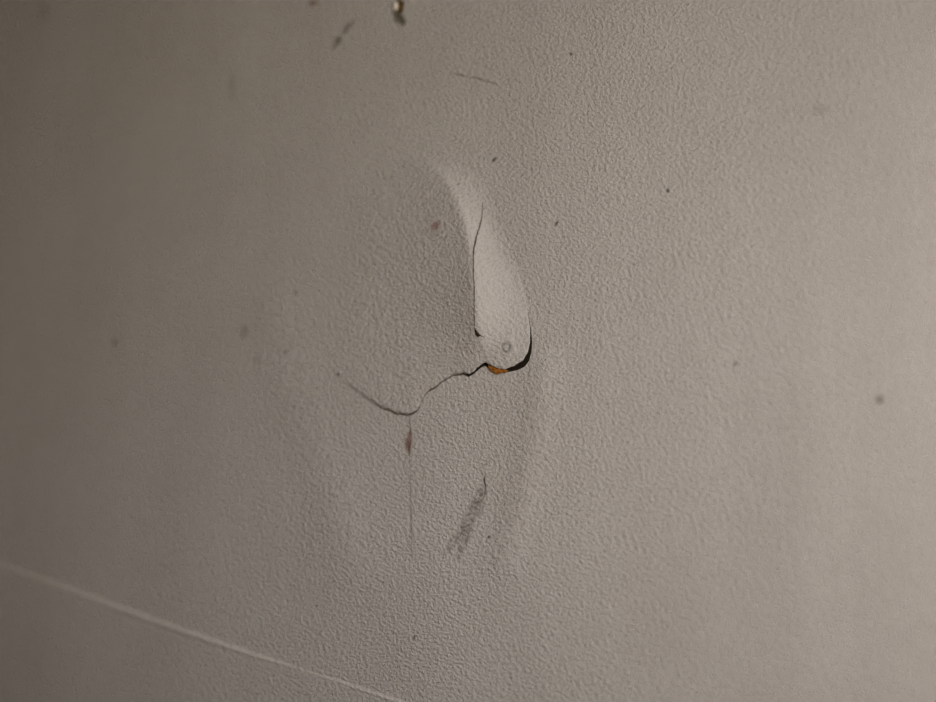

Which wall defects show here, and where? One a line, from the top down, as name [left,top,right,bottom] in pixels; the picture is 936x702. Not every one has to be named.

crack [473,217,482,336]
crack [377,373,467,421]